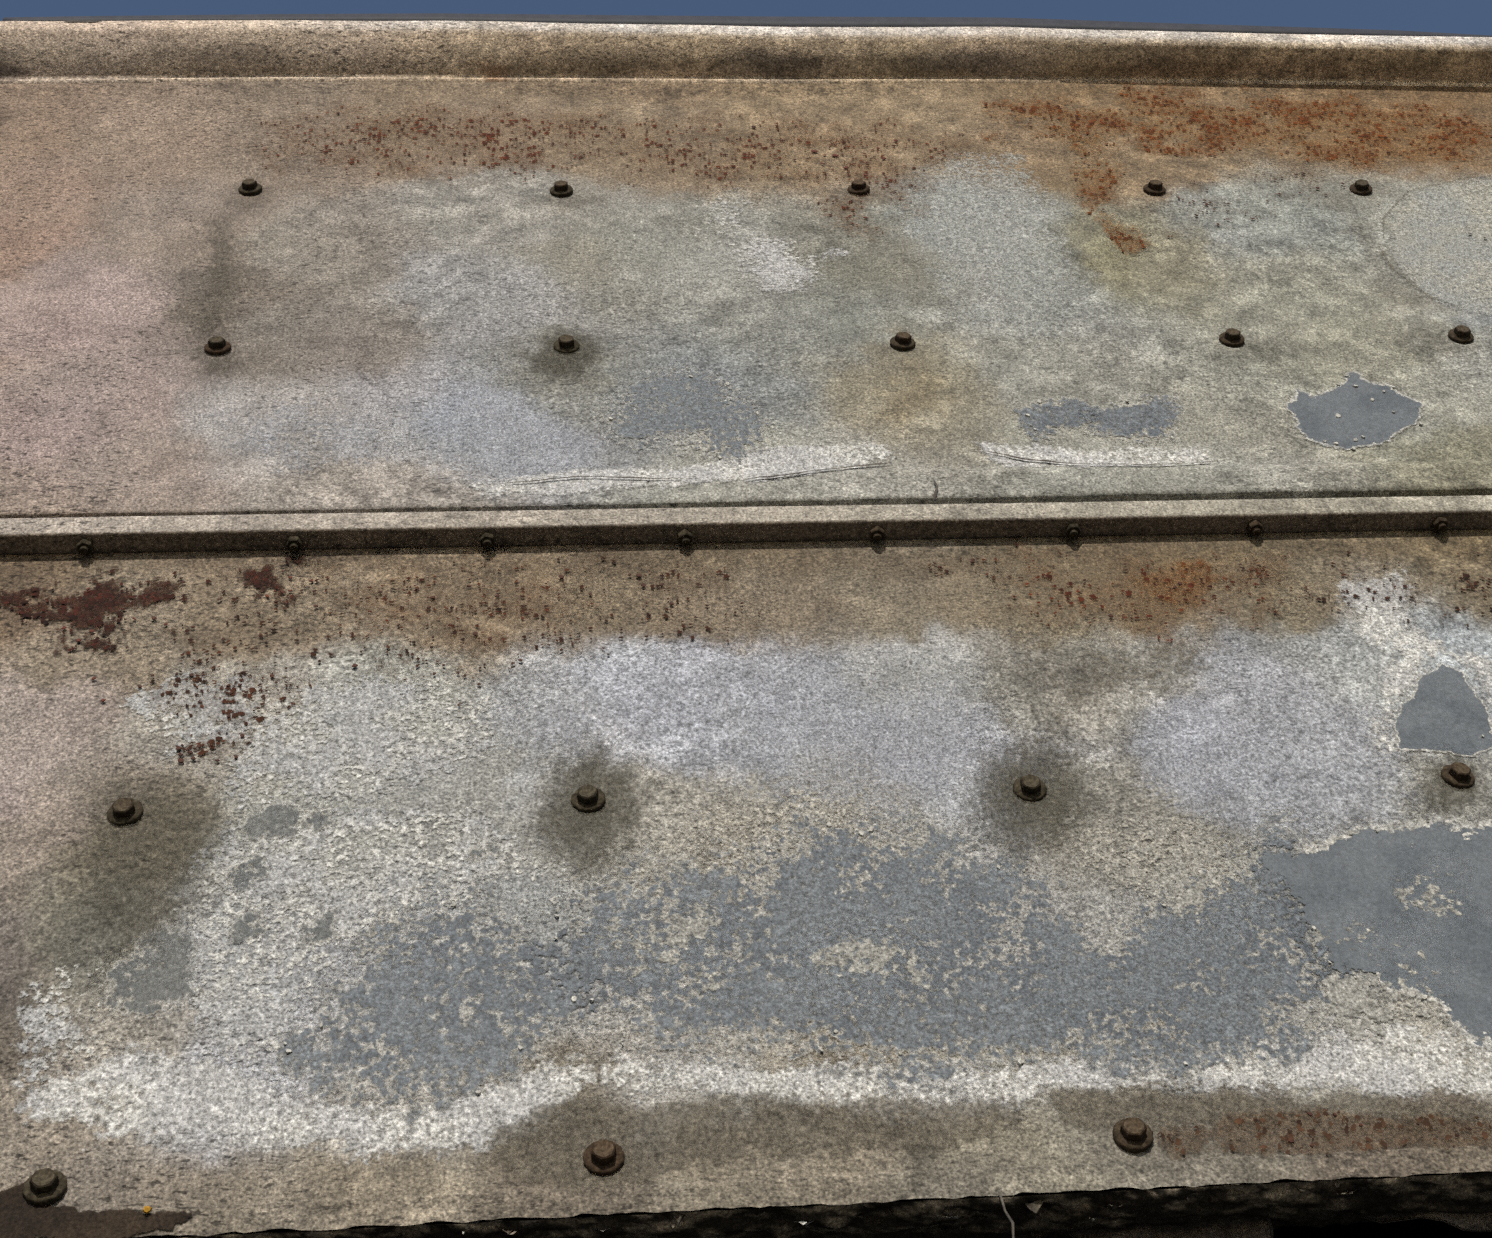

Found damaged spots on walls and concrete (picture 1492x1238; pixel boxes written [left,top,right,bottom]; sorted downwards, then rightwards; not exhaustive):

rust [249,82,1492,252]
peeling [1013,394,1183,444]
peeling [1286,371,1426,450]
rust [0,549,760,763]
peeling [1393,664,1492,757]
peeling [228,805,332,893]
peeling [232,911,265,943]
water stain [13,669,1492,1188]
peeling [276,805,1492,1122]
water stain [0,1183,192,1238]
peeling [1024,1200,1053,1217]